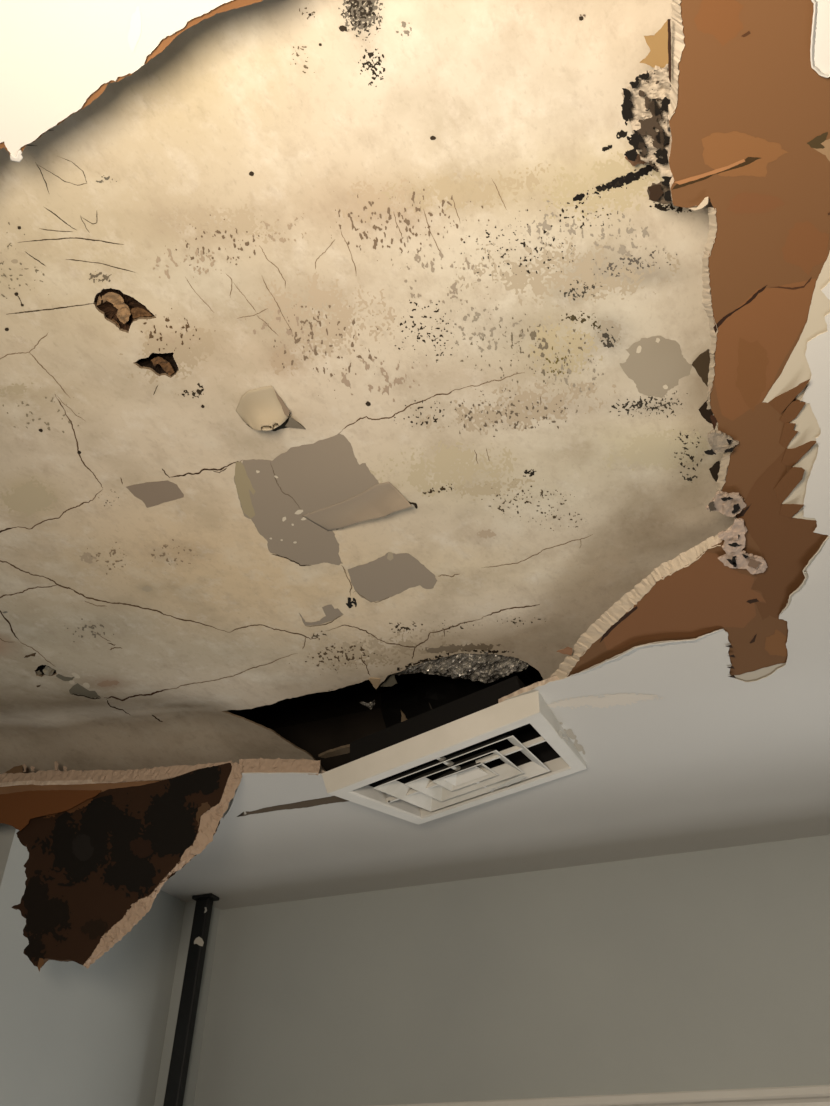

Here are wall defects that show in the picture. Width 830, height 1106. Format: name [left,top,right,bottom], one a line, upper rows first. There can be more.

mould [338,0,385,87]
spalling [621,0,685,204]
crack [0,333,123,533]
leakage [128,308,226,408]
crack [162,460,242,478]
leakage [153,195,307,283]
peeling [234,433,437,602]
crack [341,373,520,432]
leakage [245,130,710,531]
peeling [620,207,718,429]
crack [0,561,540,722]
spalling [526,534,723,687]